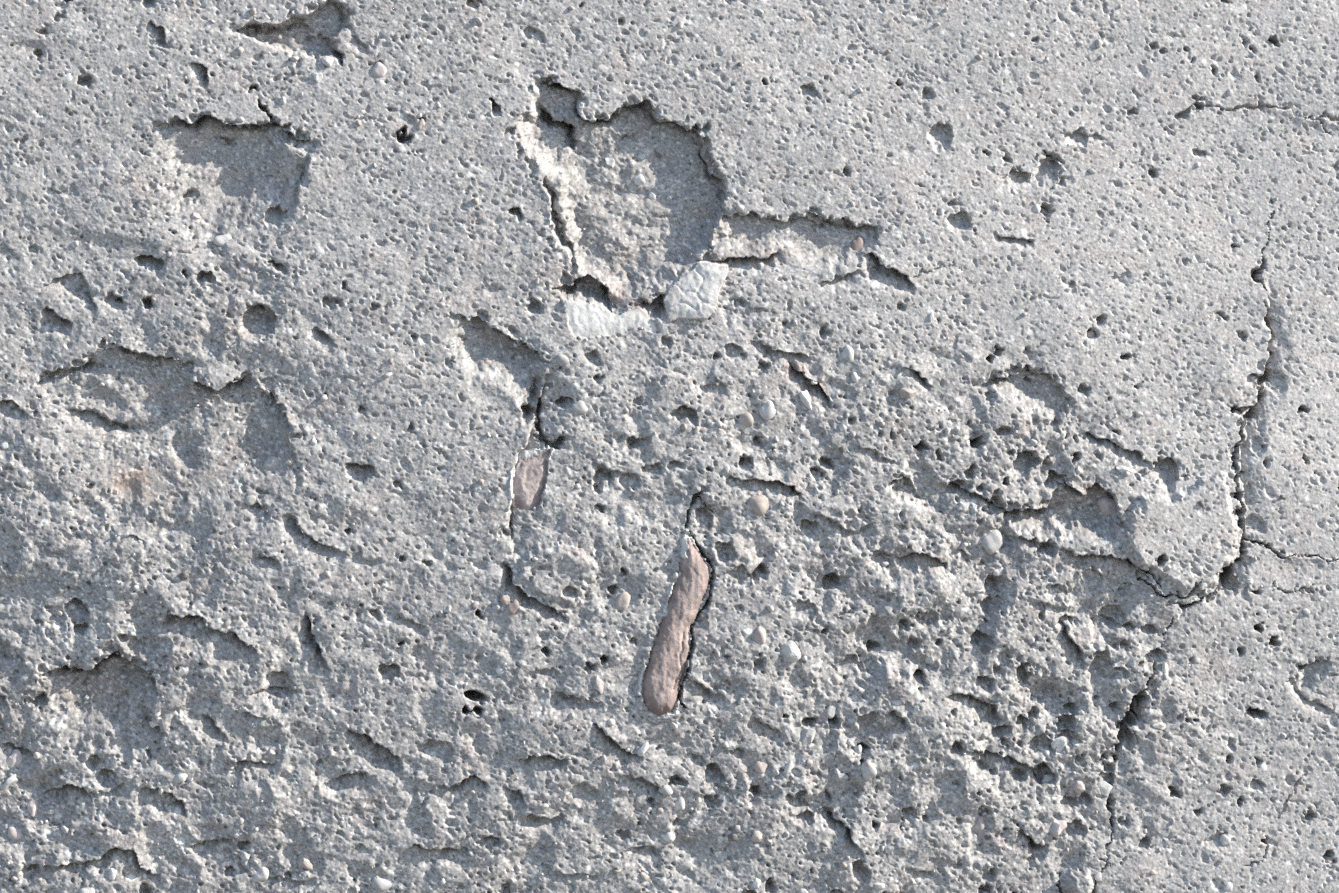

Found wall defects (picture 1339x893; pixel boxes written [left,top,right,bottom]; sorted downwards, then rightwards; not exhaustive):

spalling [489,72,914,321]
crack [1180,95,1339,142]
crack [677,489,717,711]
crack [1056,183,1339,893]